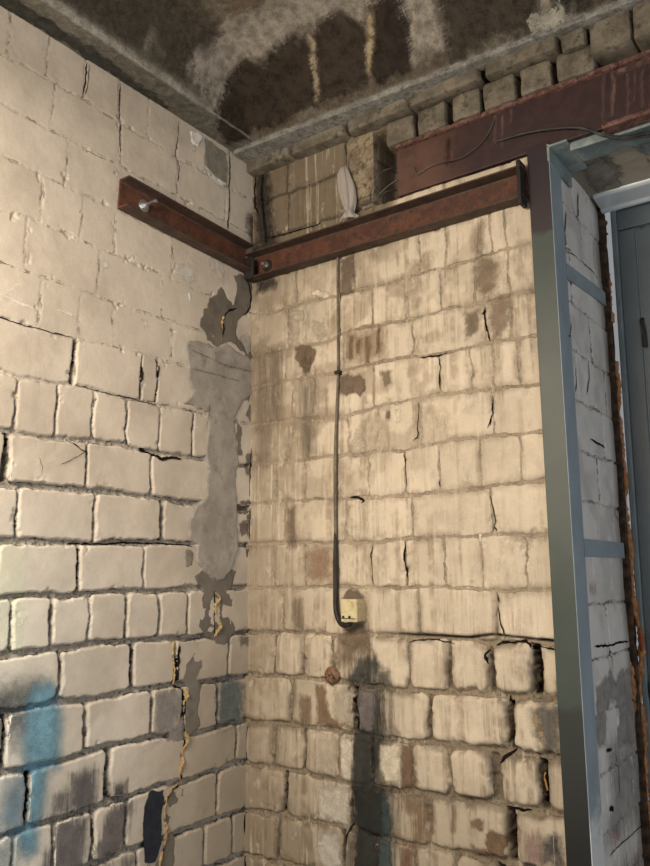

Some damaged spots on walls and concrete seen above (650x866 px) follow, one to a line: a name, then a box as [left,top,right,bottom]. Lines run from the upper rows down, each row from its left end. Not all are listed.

damp [186,0,593,144]
crack [0,317,73,338]
flaking render [200,274,253,360]
peeling [236,422,251,475]
peeling [237,500,251,557]
damp [343,589,364,599]
damp [299,685,345,729]
crack [159,641,191,866]
damp [351,694,381,790]
crack [500,730,517,763]
damp [354,745,428,866]
crack [507,805,532,813]